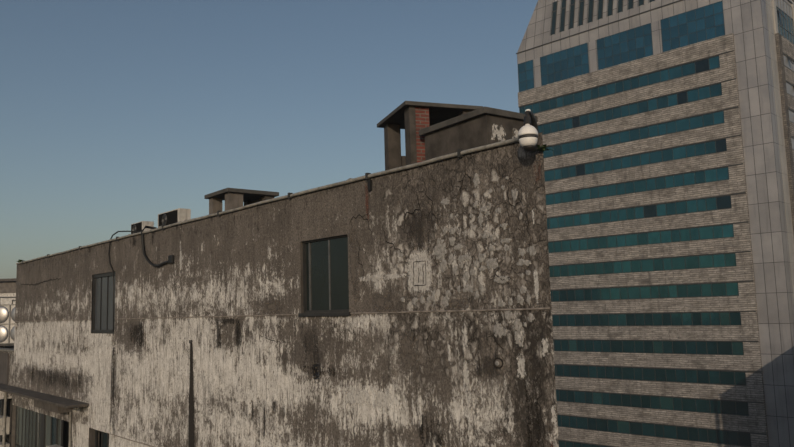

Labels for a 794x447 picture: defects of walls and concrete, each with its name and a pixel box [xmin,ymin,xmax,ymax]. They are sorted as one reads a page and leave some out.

crack [404,177,438,230]
crack [349,213,402,287]
peeling [349,173,539,378]
damp [130,323,144,347]
damp [216,318,243,352]
damp [31,369,80,387]
damp [477,355,501,378]
damp [419,415,443,447]